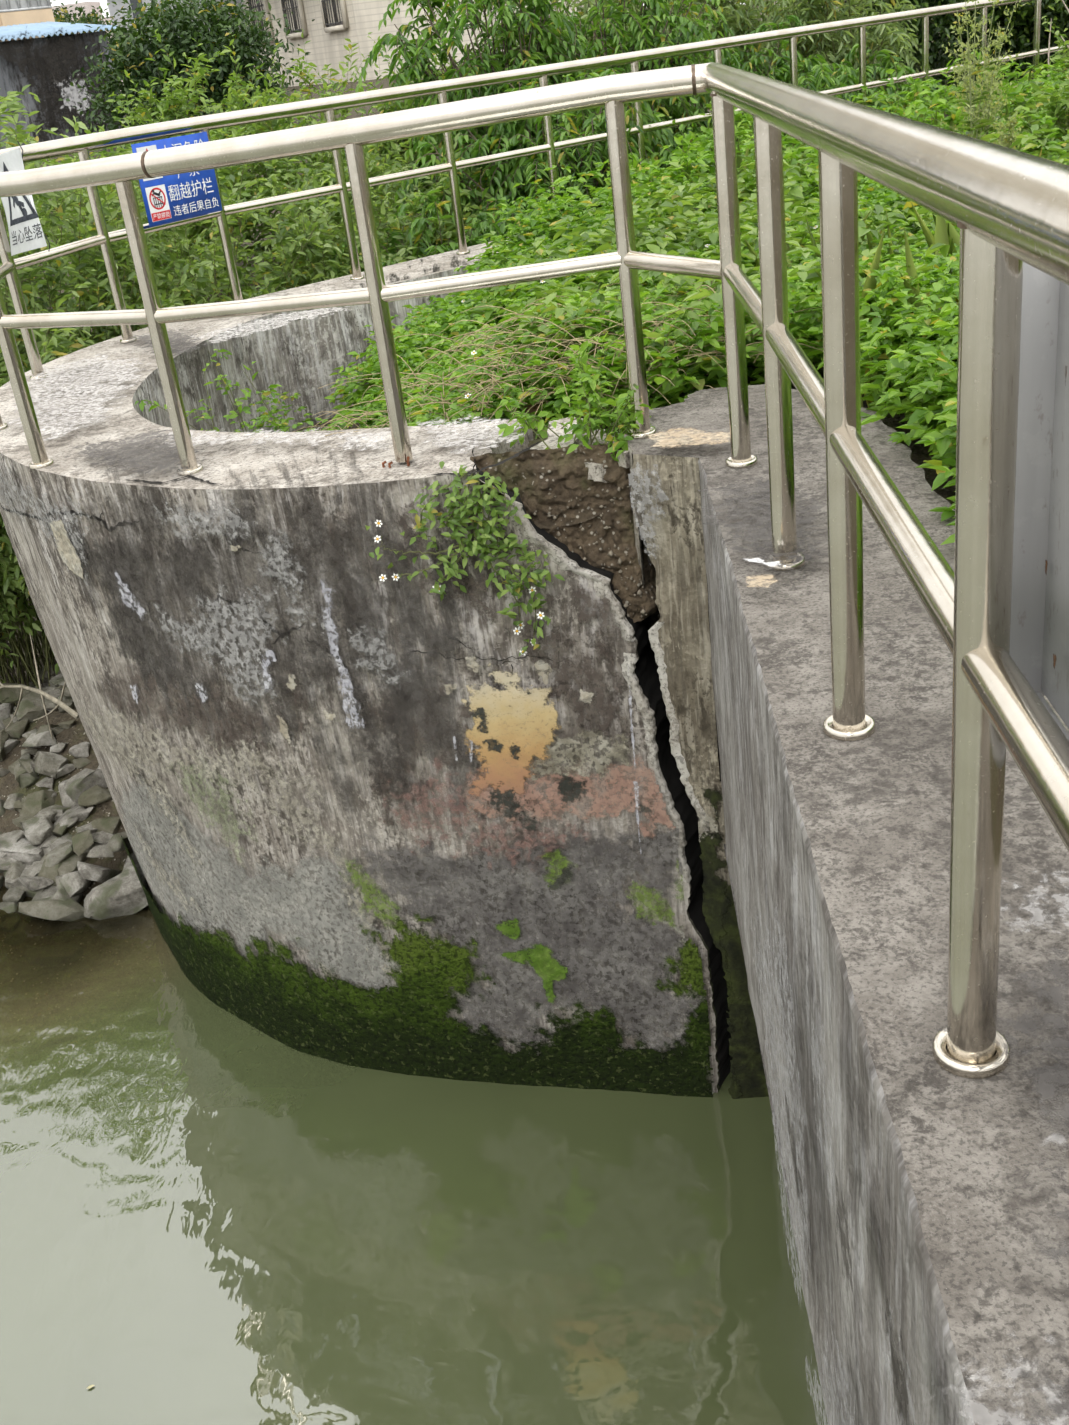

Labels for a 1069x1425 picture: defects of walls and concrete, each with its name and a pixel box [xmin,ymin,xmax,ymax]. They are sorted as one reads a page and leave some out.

water stain [48,450,706,1052]
crack [410,434,732,1091]